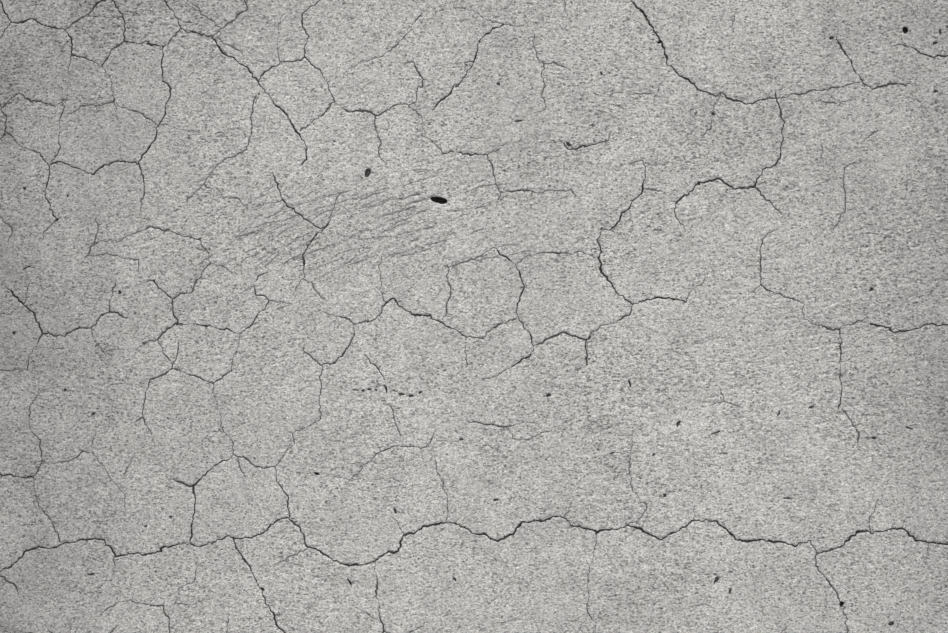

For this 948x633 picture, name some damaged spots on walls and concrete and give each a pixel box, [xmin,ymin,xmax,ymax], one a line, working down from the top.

crack [0,0,577,239]
crack [543,130,611,150]
crack [631,0,910,231]
crack [893,44,948,58]
crack [0,160,948,633]